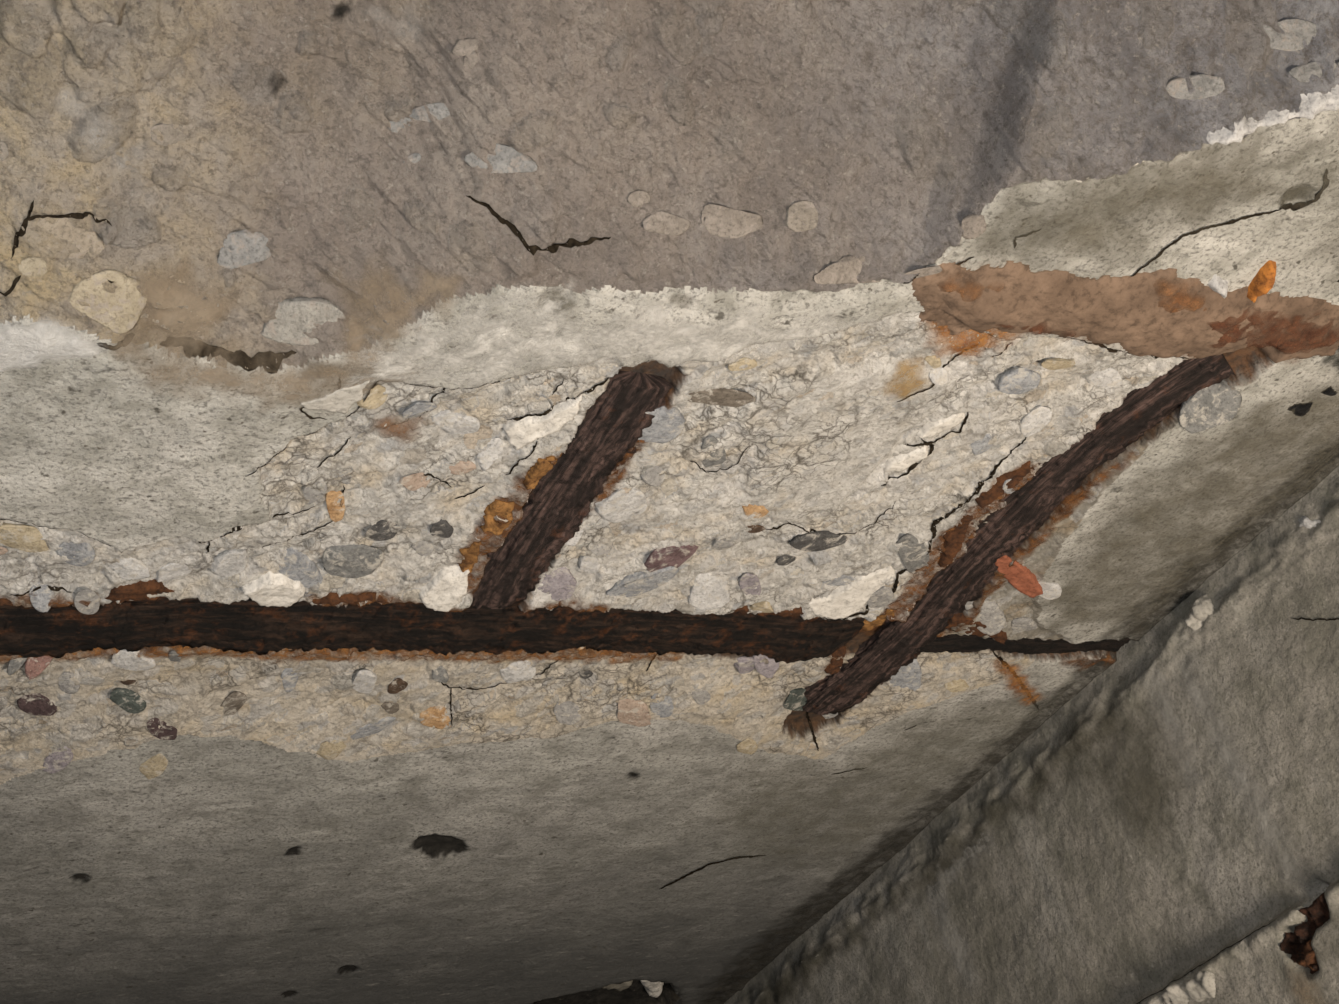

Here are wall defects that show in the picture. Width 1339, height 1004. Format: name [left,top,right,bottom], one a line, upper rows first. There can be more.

crack [0,200,112,297]
crack [467,196,611,256]
rust [0,260,1339,715]
spalling [0,311,1242,785]
spalling [533,980,681,1004]
rust [1297,939,1318,971]